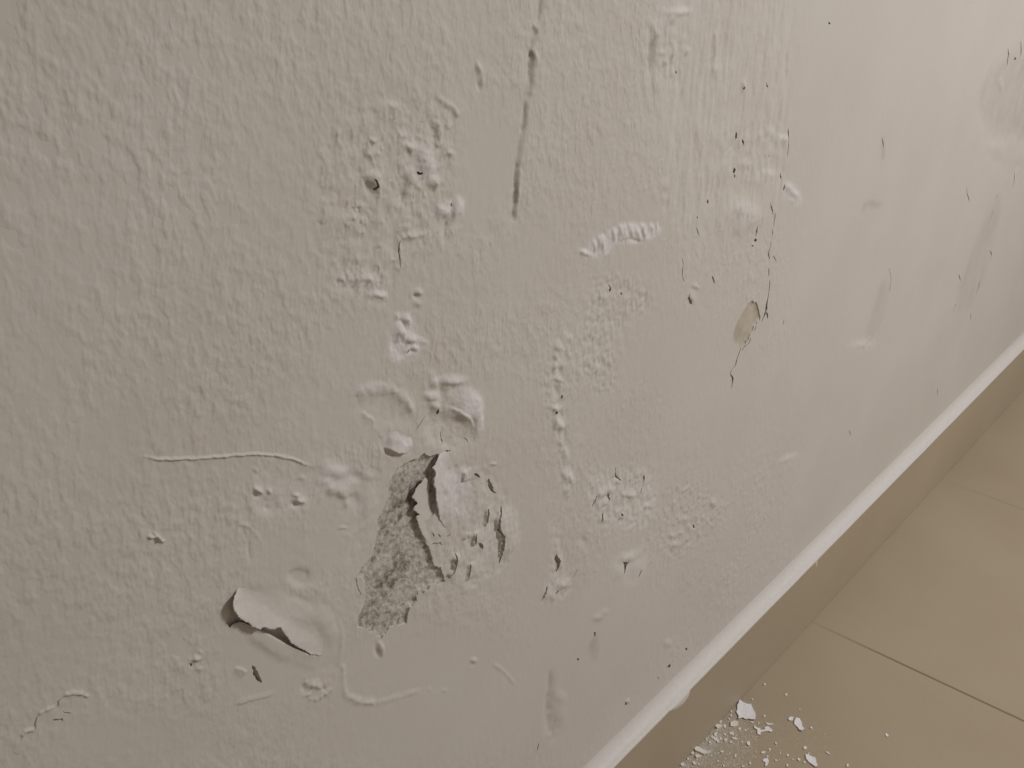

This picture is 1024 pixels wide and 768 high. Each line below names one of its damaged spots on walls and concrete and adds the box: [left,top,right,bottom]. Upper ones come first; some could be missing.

peeling [733,301,761,350]
peeling [356,368,522,661]
peeling [233,585,324,656]